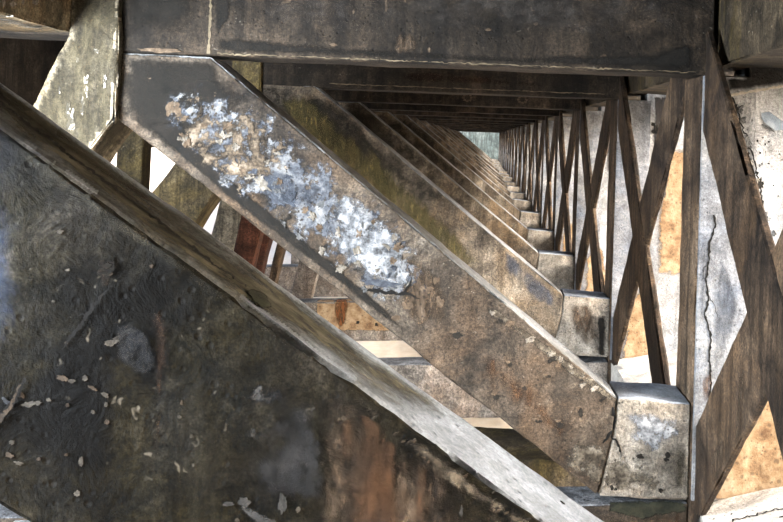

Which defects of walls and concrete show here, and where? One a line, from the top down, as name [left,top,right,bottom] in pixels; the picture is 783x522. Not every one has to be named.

peeling [165,85,444,324]
peeling [105,326,153,372]
crack [702,215,718,399]
rust [356,419,394,522]
crack [603,401,622,456]
crack [731,508,783,522]